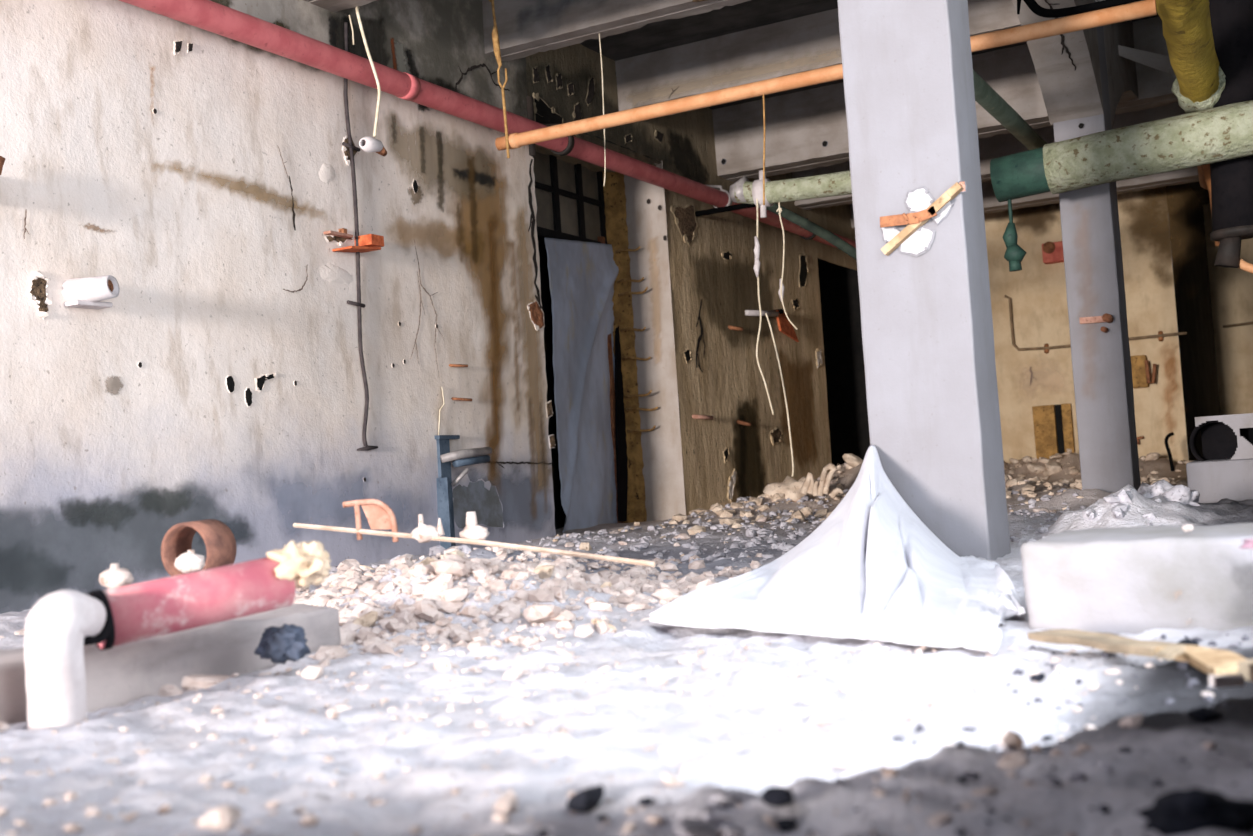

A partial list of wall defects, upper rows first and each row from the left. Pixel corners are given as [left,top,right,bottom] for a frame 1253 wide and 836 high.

water stain [329,16,463,95]
spalling [532,63,596,138]
water stain [388,115,494,209]
flaking render [26,270,52,320]
corrosion [398,158,519,479]
spalling [225,373,277,408]
water stain [274,477,403,532]
water stain [0,487,252,614]